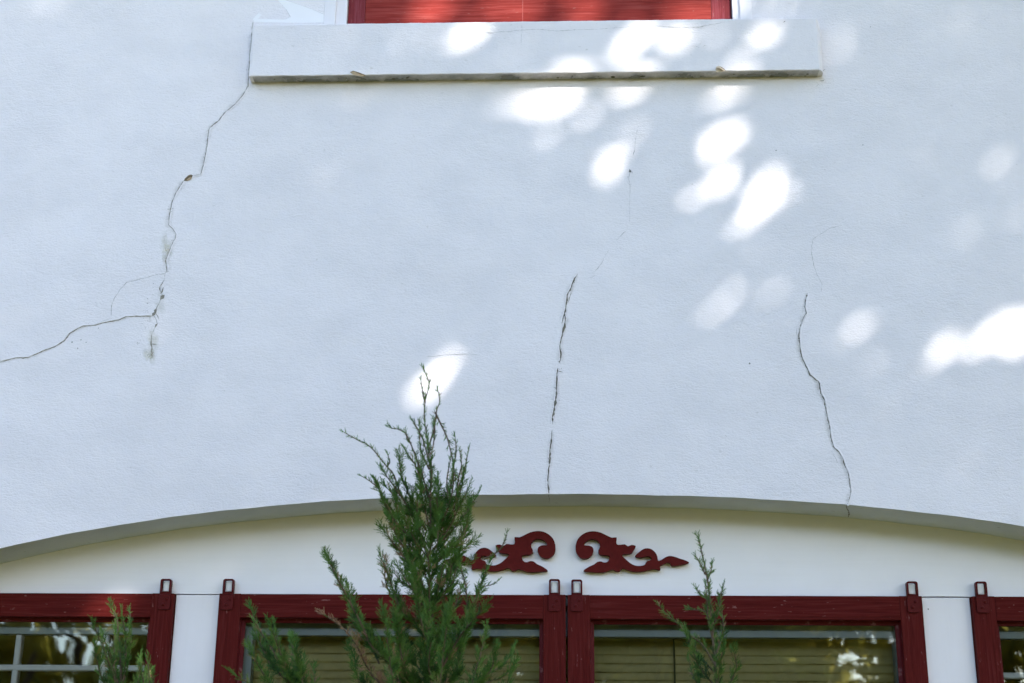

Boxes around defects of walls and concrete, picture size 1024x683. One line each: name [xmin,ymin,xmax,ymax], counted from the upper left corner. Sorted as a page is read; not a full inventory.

crack [0,22,255,362]
crack [546,252,608,501]
crack [796,226,853,517]